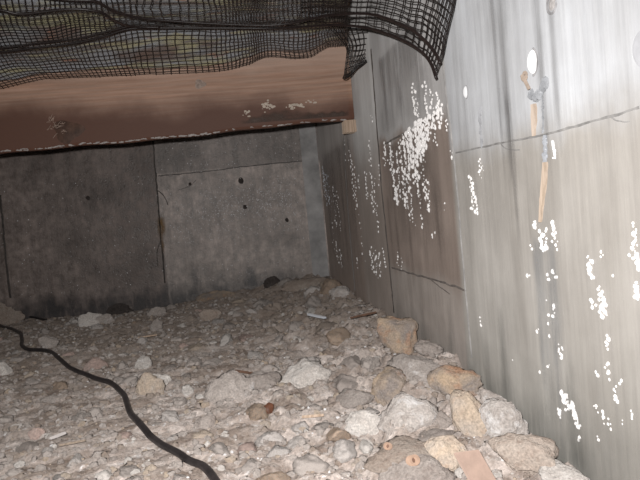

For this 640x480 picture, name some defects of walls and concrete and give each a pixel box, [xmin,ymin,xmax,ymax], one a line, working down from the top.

leakage [345,81,448,233]
leakage [468,175,478,215]
leakage [529,220,558,252]
leakage [586,250,603,280]
leakage [628,222,640,272]
leakage [589,285,607,319]
leakage [595,362,622,404]
leakage [557,389,581,442]